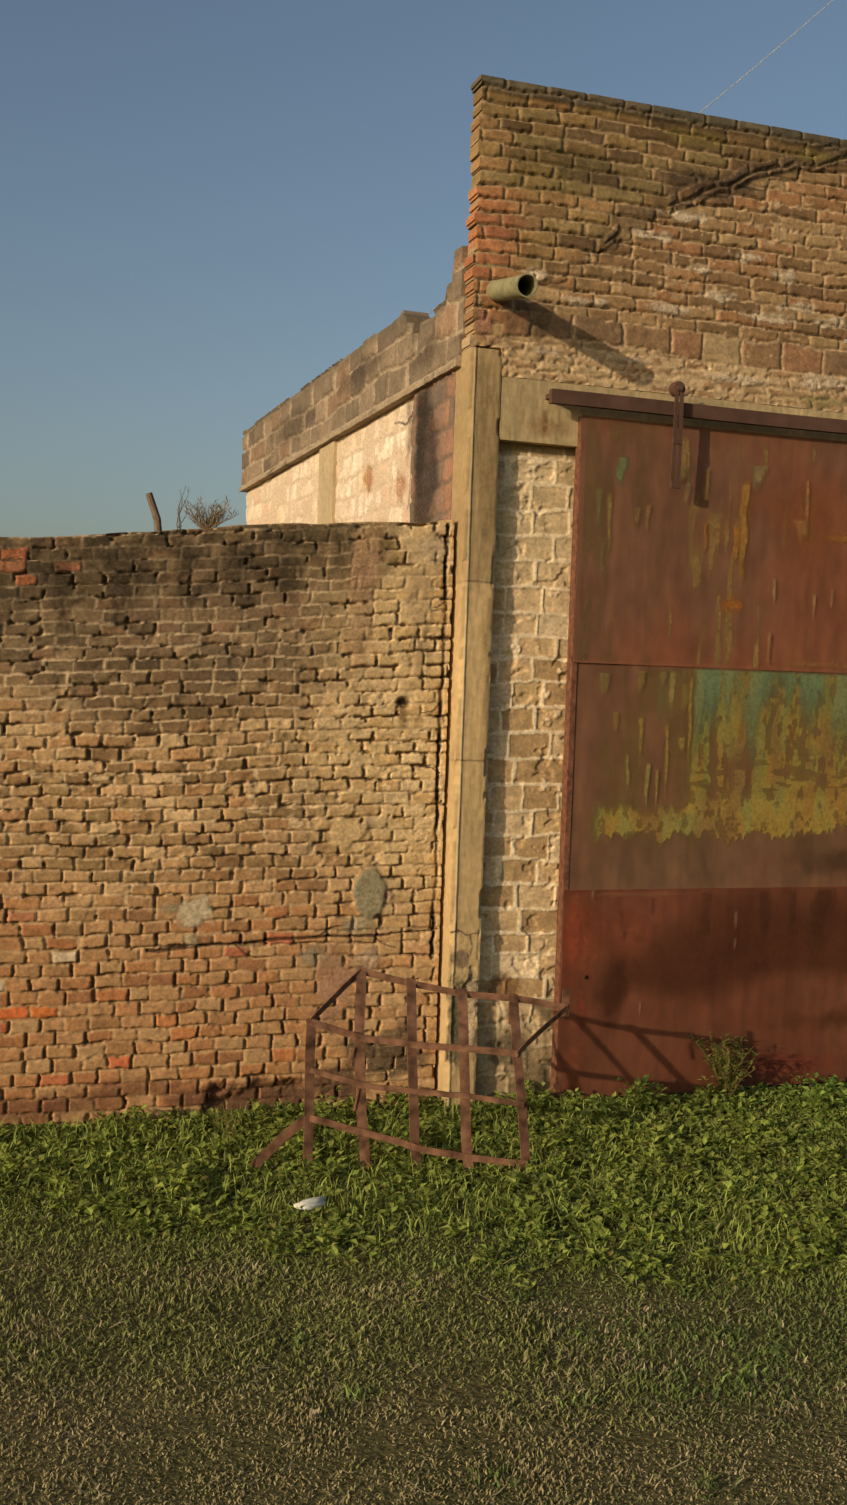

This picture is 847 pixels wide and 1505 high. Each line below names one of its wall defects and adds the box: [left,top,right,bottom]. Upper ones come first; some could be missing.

crack [538,168,833,285]
damp [0,531,196,588]
damp [215,523,380,646]
crack [428,524,450,608]
peeling [595,439,847,845]
crack [420,666,444,828]
crack [146,911,478,958]